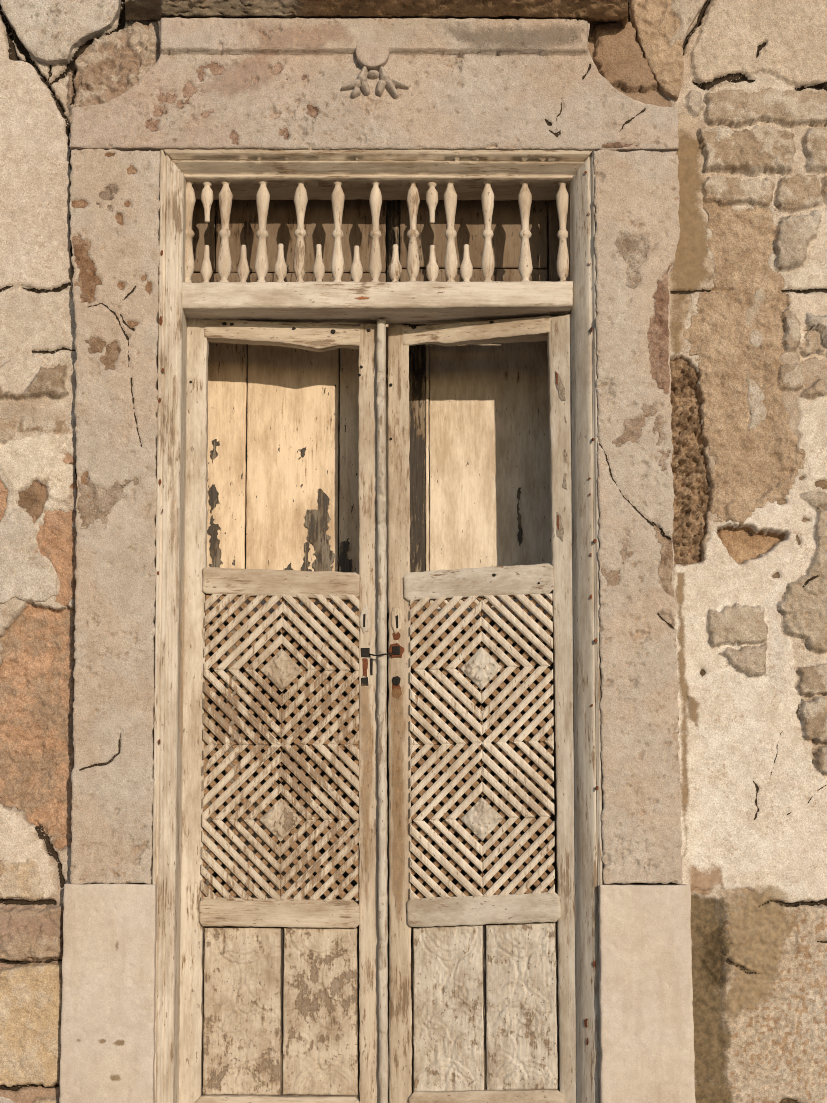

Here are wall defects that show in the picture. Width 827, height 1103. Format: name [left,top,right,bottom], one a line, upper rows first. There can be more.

crack [683,0,711,55]
crack [692,42,766,90]
crack [794,82,827,91]
crack [0,0,126,293]
spalling [612,192,827,597]
crack [599,443,671,540]
spalling [0,452,139,850]
crack [759,899,827,907]